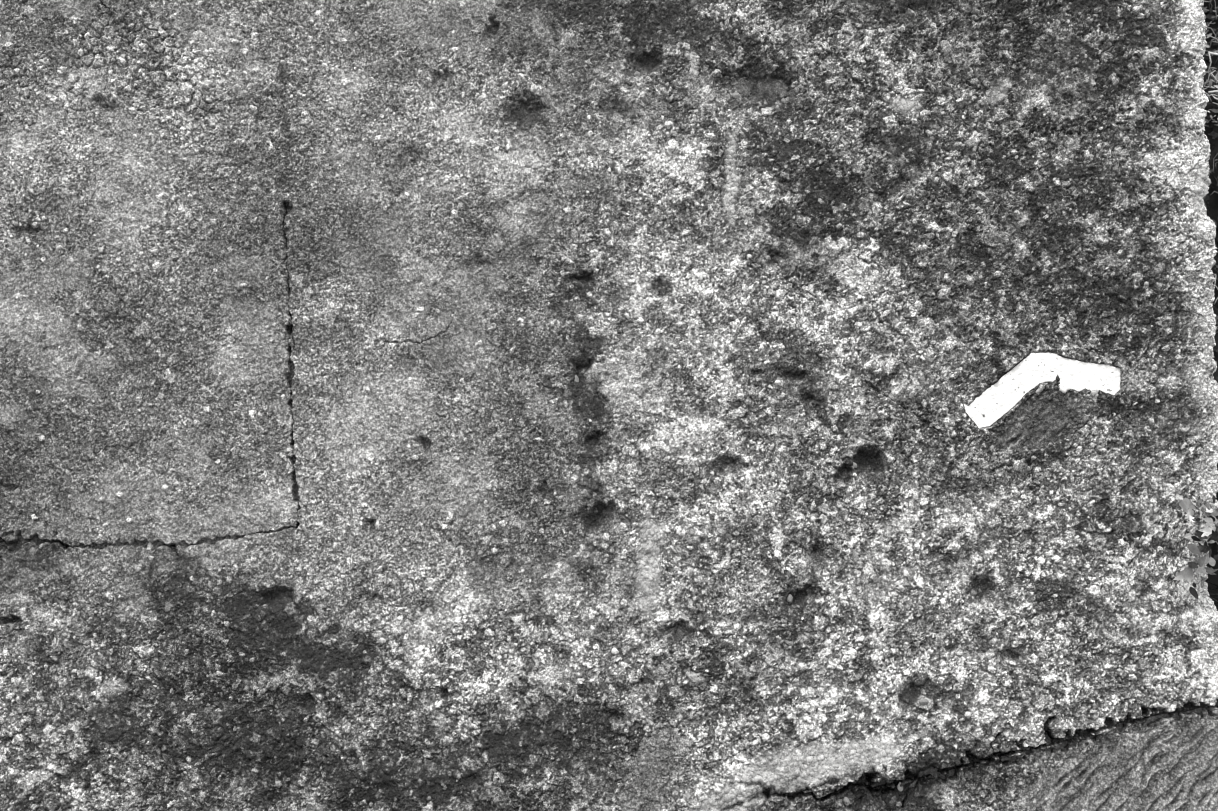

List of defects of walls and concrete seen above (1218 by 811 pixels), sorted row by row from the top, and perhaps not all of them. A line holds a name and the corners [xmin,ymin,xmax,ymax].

crack [287,281,300,528]
crack [717,703,1218,809]